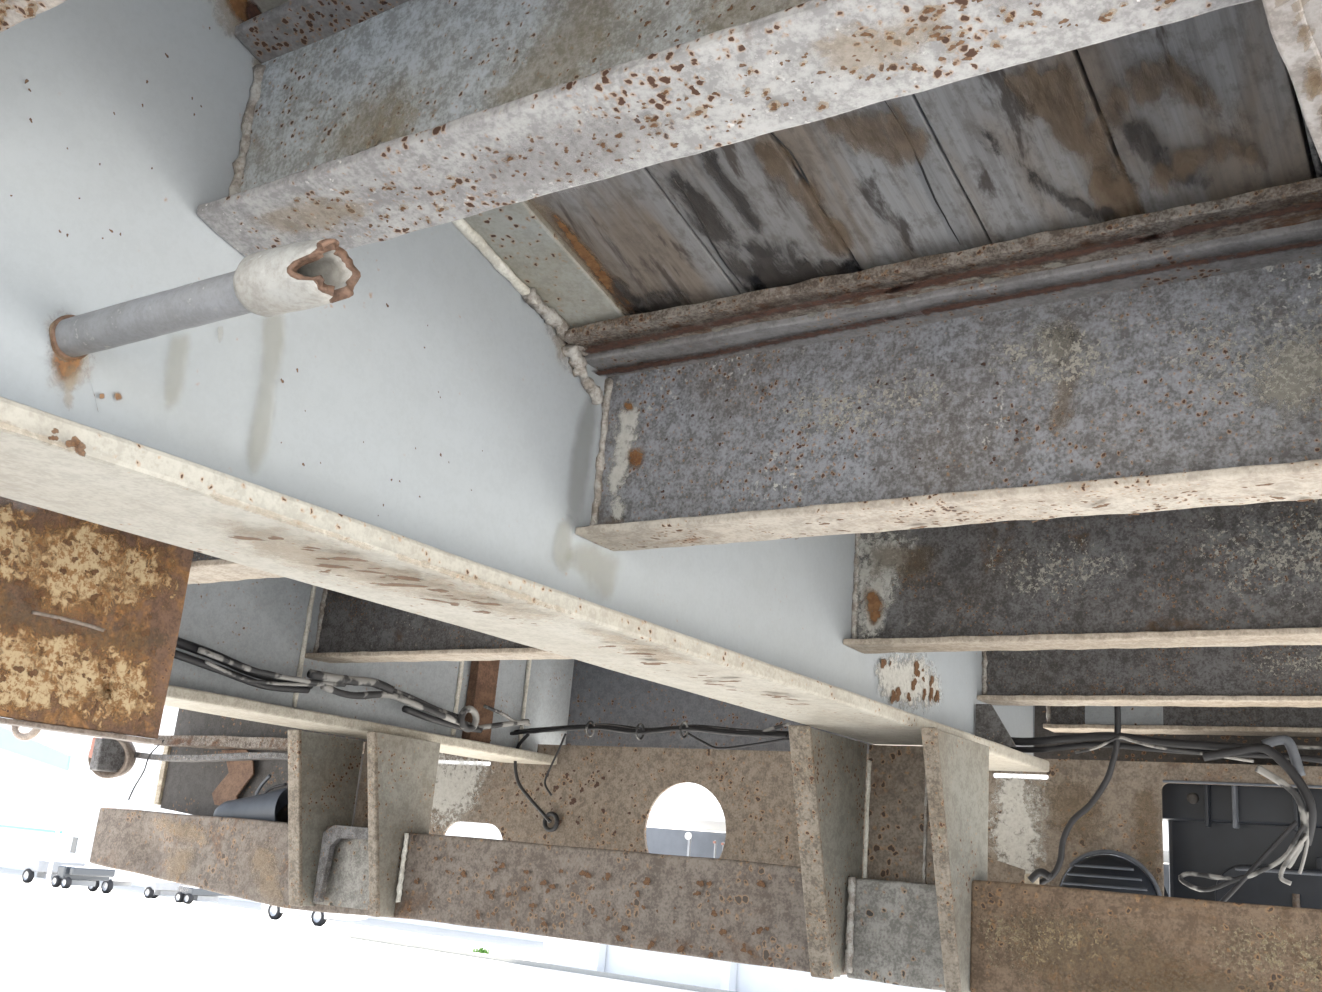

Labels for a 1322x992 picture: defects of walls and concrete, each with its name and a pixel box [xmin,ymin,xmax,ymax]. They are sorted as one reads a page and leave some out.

corrosion [479,0,1043,183]
damp [825,106,929,166]
damp [1005,56,1267,221]
corrosion [288,166,458,232]
corrosion [552,214,633,312]
corrosion [582,201,1322,376]
corrosion [53,354,82,379]
corrosion [629,448,646,477]
corrosion [0,532,165,693]
corrosion [865,590,883,625]
corrosion [434,857,658,942]
corrosion [679,881,727,958]